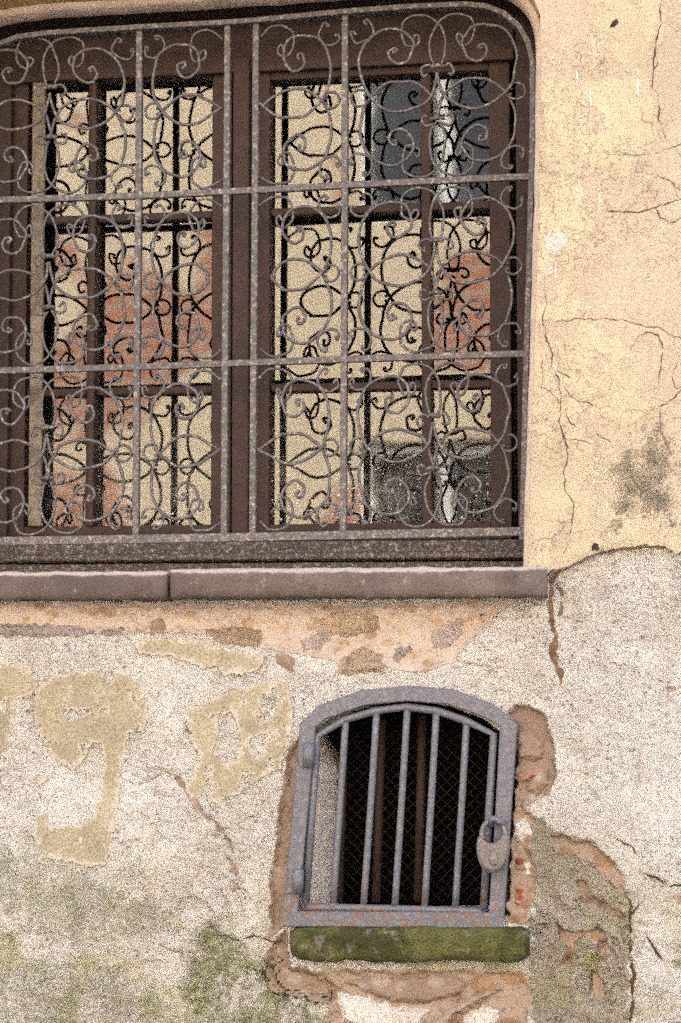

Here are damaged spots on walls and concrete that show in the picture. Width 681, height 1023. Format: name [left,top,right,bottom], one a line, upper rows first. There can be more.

peeling [530,0,681,579]
crack [536,283,681,687]
crack [605,176,680,223]
damp [612,423,673,534]
crack [626,3,680,156]
flaking render [0,598,634,1023]